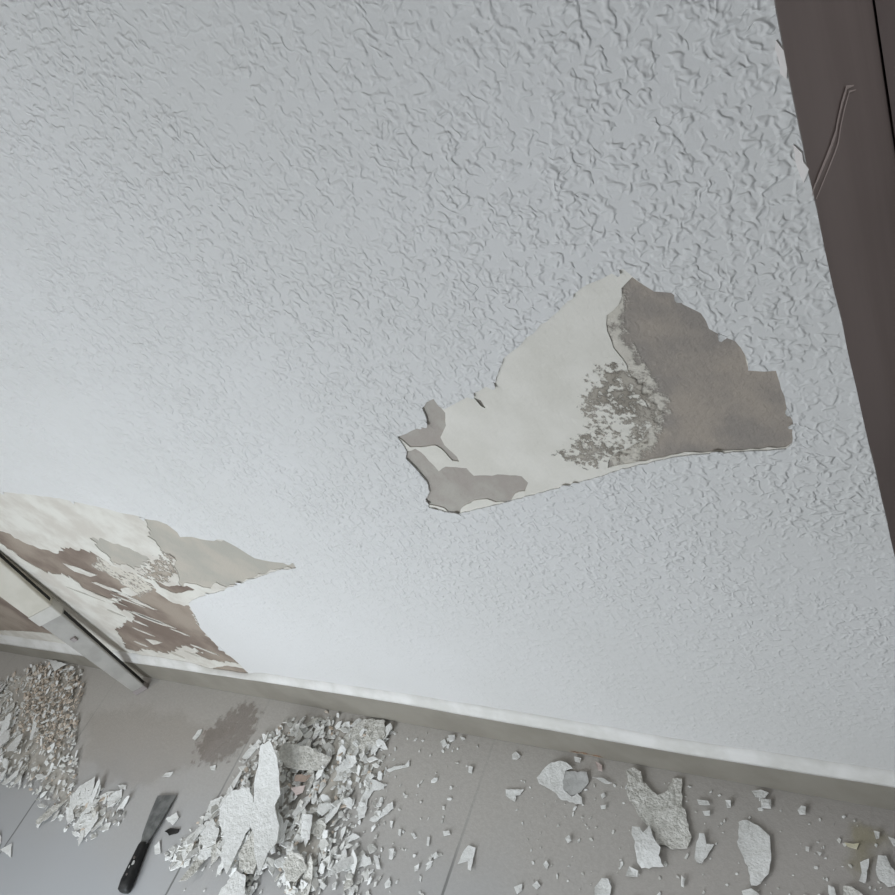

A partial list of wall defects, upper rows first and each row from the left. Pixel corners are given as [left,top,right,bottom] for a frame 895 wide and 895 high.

peeling [399,269,796,516]
peeling [0,492,295,673]